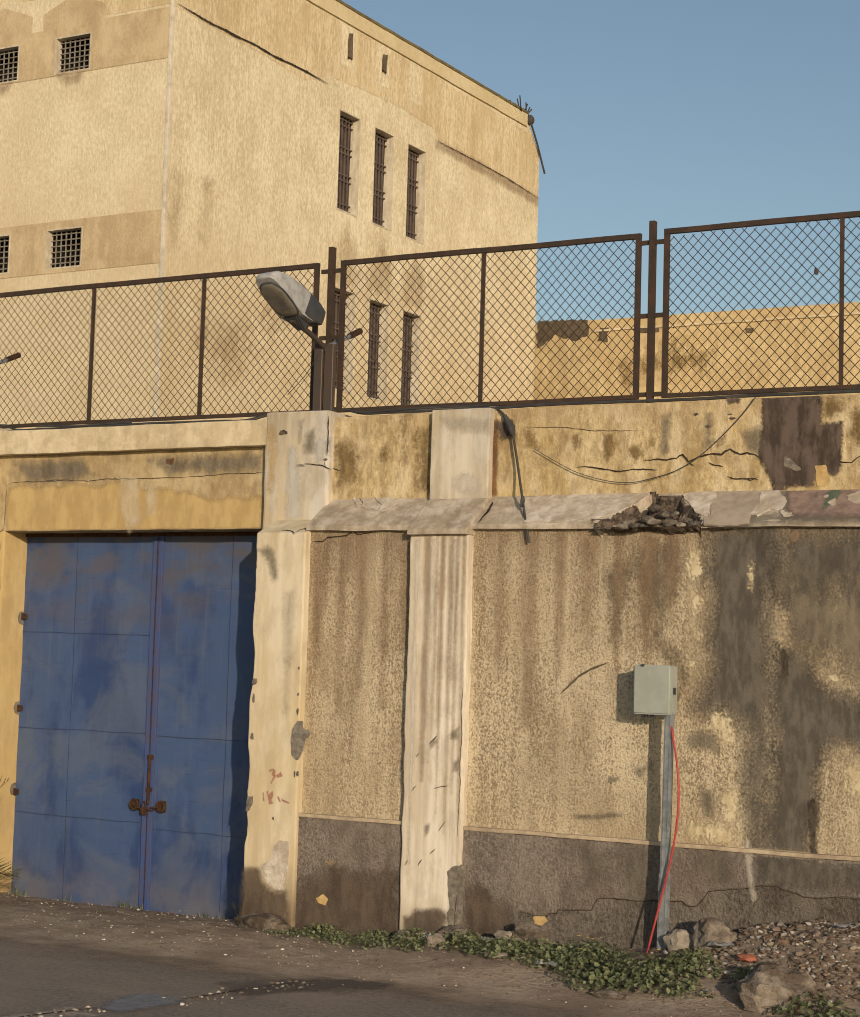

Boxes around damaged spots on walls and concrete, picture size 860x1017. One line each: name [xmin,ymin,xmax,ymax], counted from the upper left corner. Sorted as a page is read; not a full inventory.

crack [179,4,328,84]
crack [0,472,259,548]
leakage [604,435,615,461]
peeling [523,491,717,535]
crack [580,448,762,481]
peeling [750,490,793,518]
peeling [815,465,860,506]
leakage [603,544,685,701]
leakage [689,396,860,895]
spalling [291,708,310,777]
peeling [260,840,290,891]
crack [521,886,856,917]